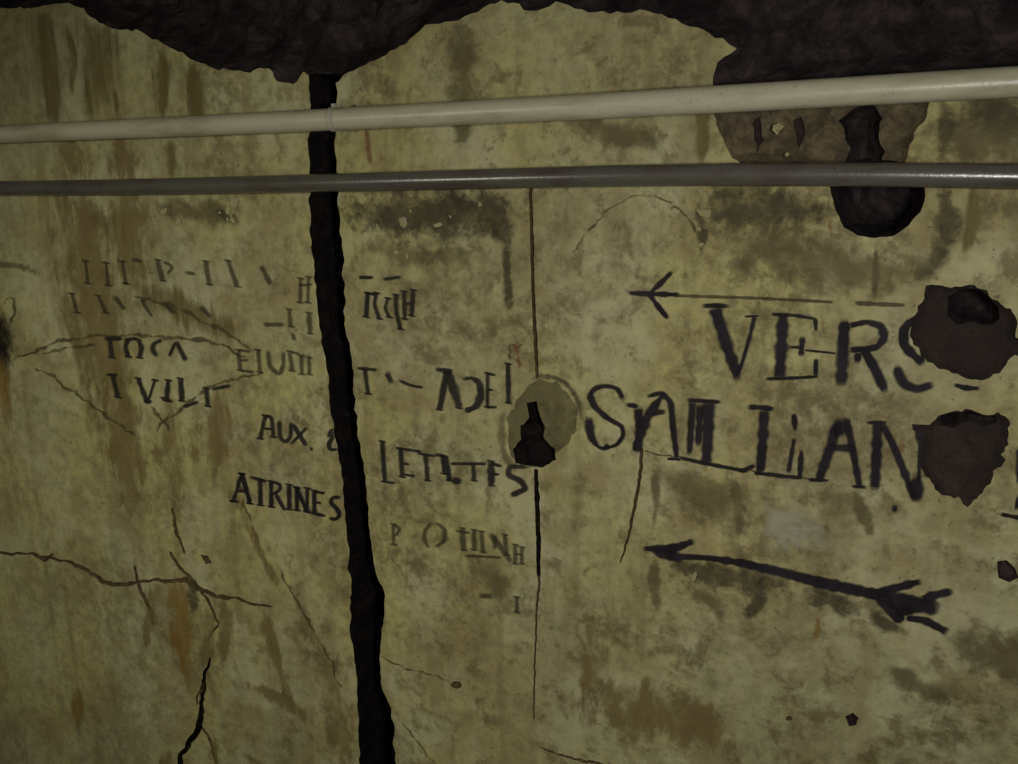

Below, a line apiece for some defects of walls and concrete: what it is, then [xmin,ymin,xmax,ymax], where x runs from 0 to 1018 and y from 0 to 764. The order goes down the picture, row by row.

spalling [0,0,1018,86]
spalling [714,102,930,163]
hole [830,187,926,238]
damp [0,317,11,408]
spalling [910,285,1018,381]
crack [0,74,448,764]
spalling [912,409,1010,507]